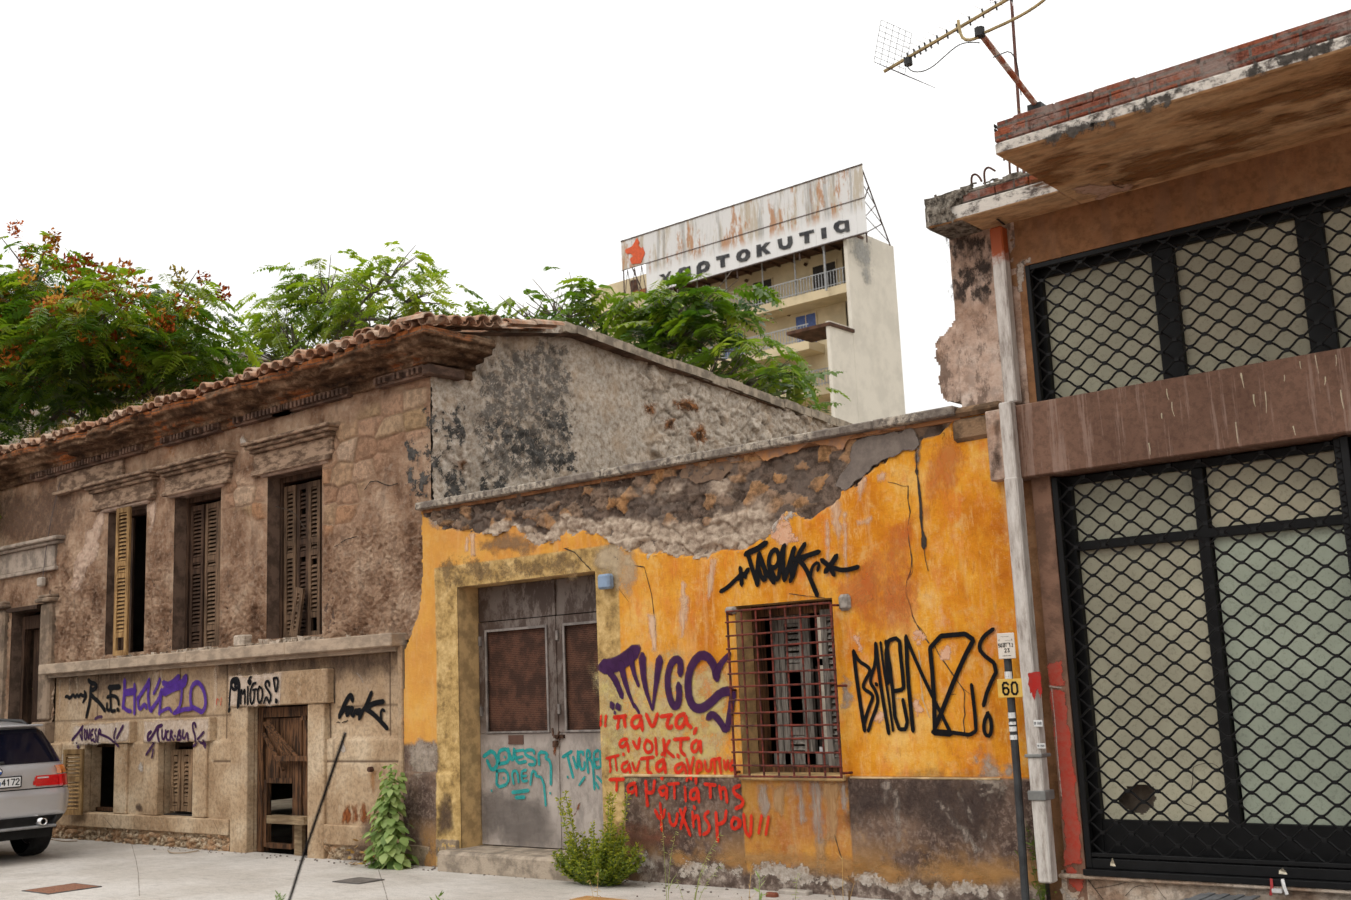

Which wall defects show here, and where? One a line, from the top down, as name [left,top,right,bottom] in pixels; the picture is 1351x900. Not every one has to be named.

water stain [1241,37,1333,79]
water stain [1019,73,1351,190]
spalling [646,399,707,443]
spalling [422,422,952,594]
crack [889,441,970,732]
water stain [759,780,1000,874]